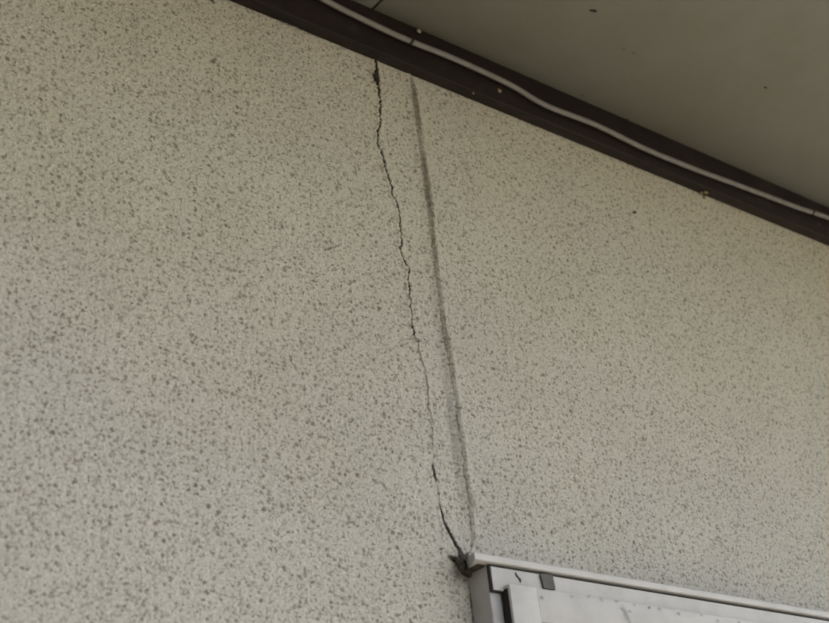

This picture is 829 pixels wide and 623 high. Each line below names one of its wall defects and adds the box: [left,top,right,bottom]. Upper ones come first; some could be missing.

crack [369,59,437,481]
crack [436,506,463,553]